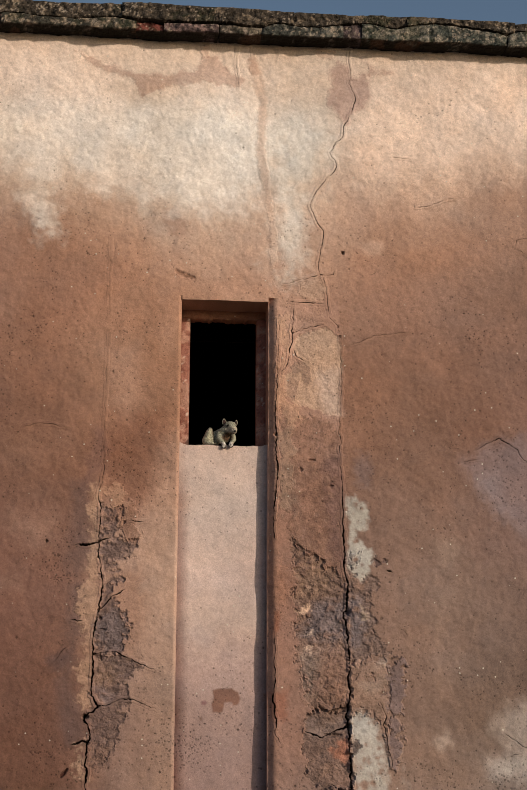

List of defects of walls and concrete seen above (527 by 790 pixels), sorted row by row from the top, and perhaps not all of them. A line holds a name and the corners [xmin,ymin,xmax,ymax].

water stain [0,33,527,300]
crack [415,195,456,210]
flaking render [58,481,144,783]
crack [48,332,160,790]
flaking render [259,277,410,790]
crack [268,48,408,790]
efflorescence [346,493,377,582]
crack [473,431,527,466]
crack [503,731,527,761]